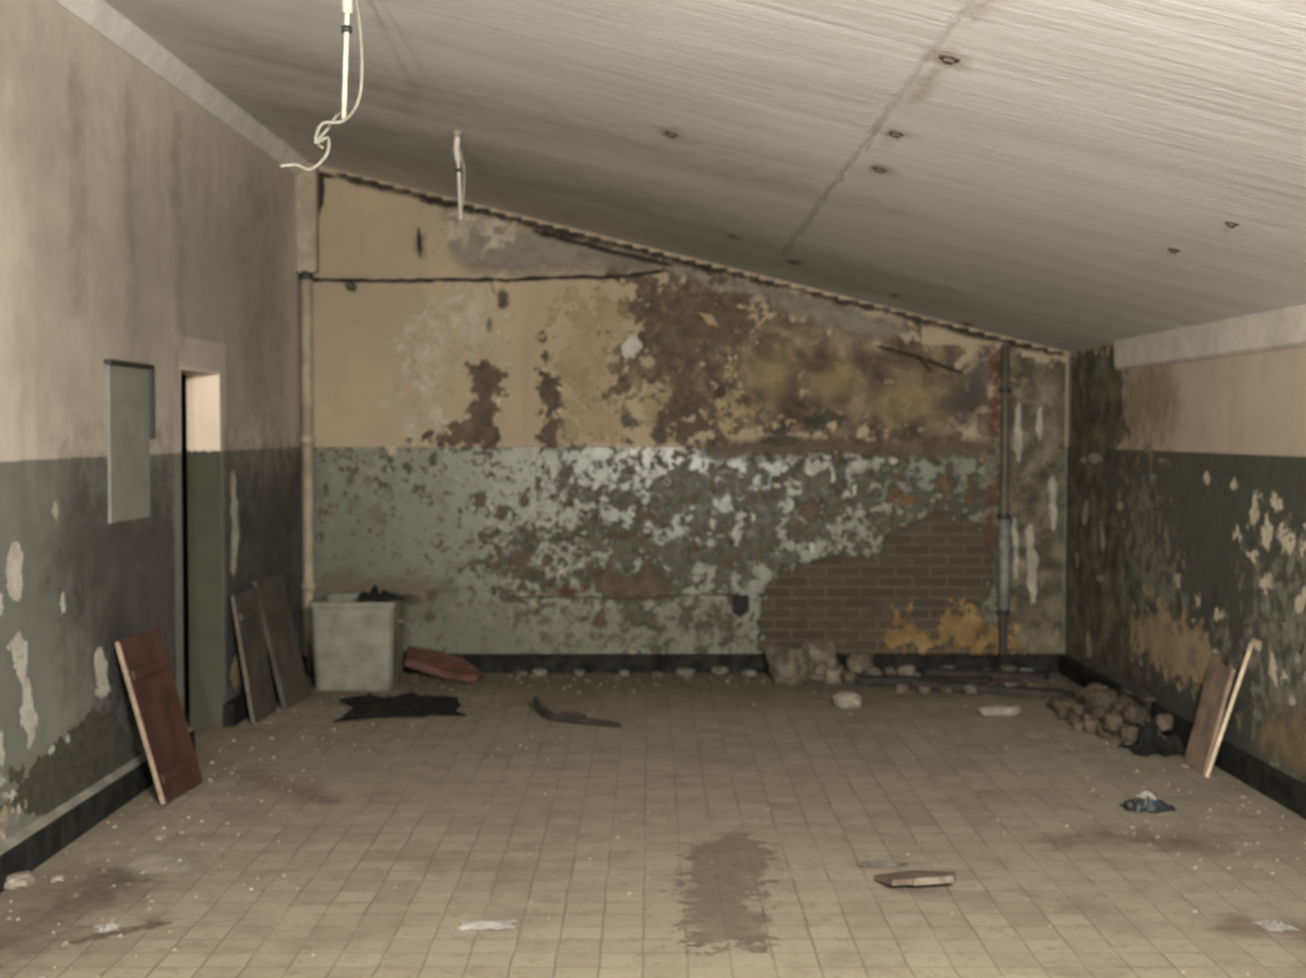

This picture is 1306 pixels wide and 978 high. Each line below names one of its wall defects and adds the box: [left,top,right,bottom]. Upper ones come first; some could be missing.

water stain [498,290,509,308]
flaking render [406,272,1038,654]
water stain [586,256,1168,689]
peeling [1013,402,1043,462]
peeling [1048,476,1058,530]
peeling [0,540,24,616]
peeling [1116,427,1306,779]
peeling [6,631,70,756]
peeling [94,646,111,700]
flaking render [0,730,28,841]